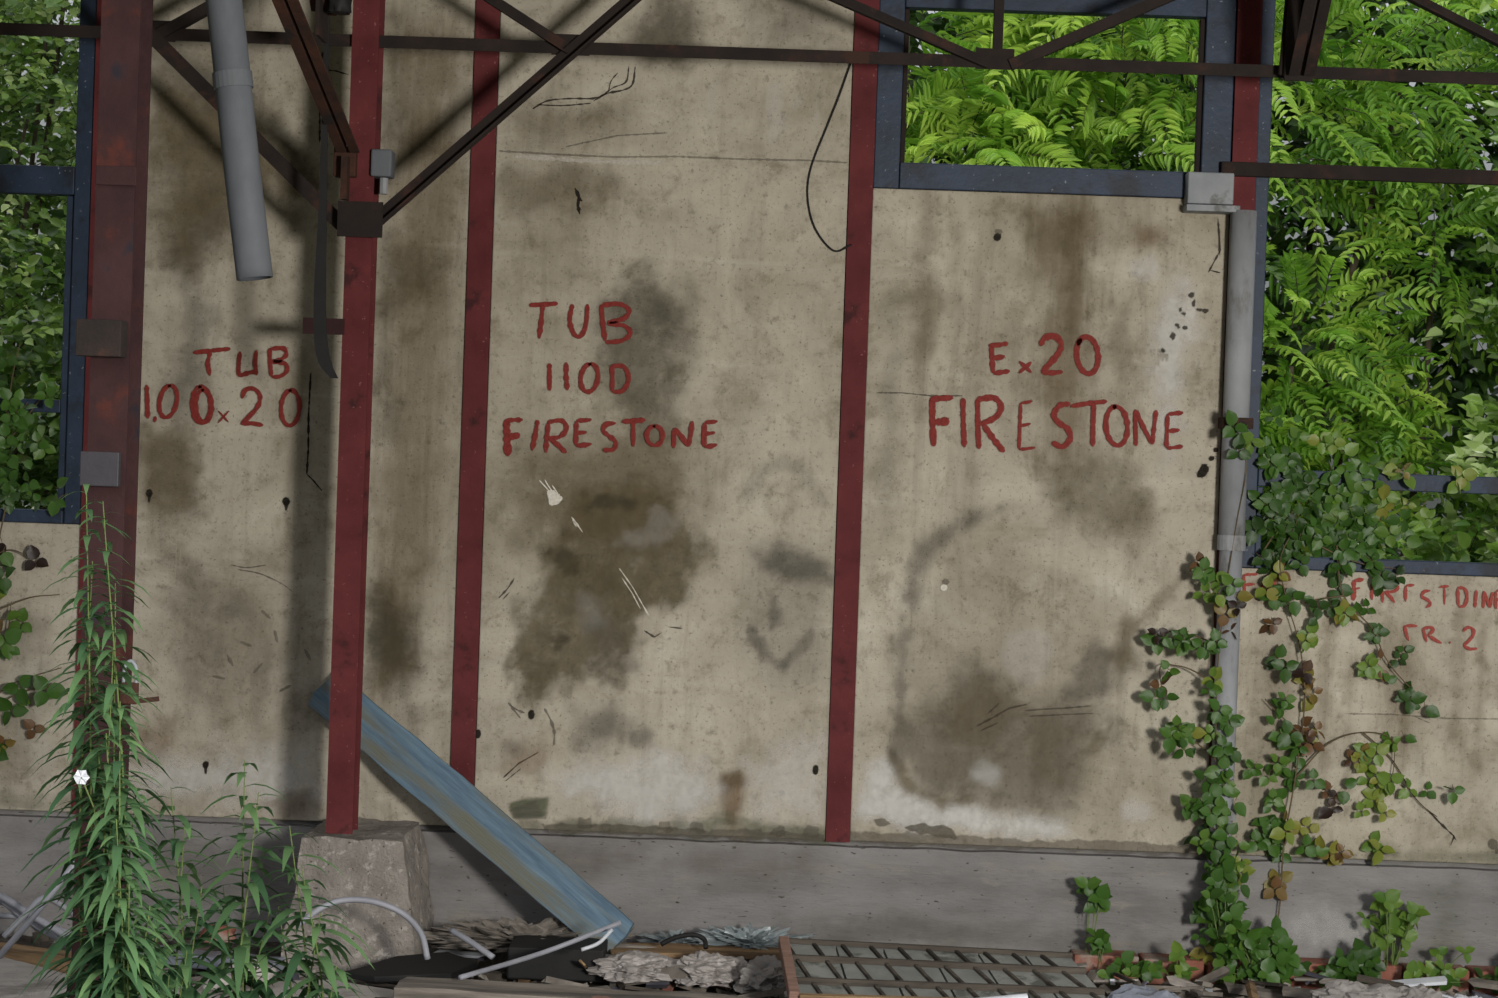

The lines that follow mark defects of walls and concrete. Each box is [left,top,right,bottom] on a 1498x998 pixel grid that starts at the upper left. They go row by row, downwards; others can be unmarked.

water stain [160,88,226,253]
water stain [514,487,693,696]
water stain [861,766,1061,833]